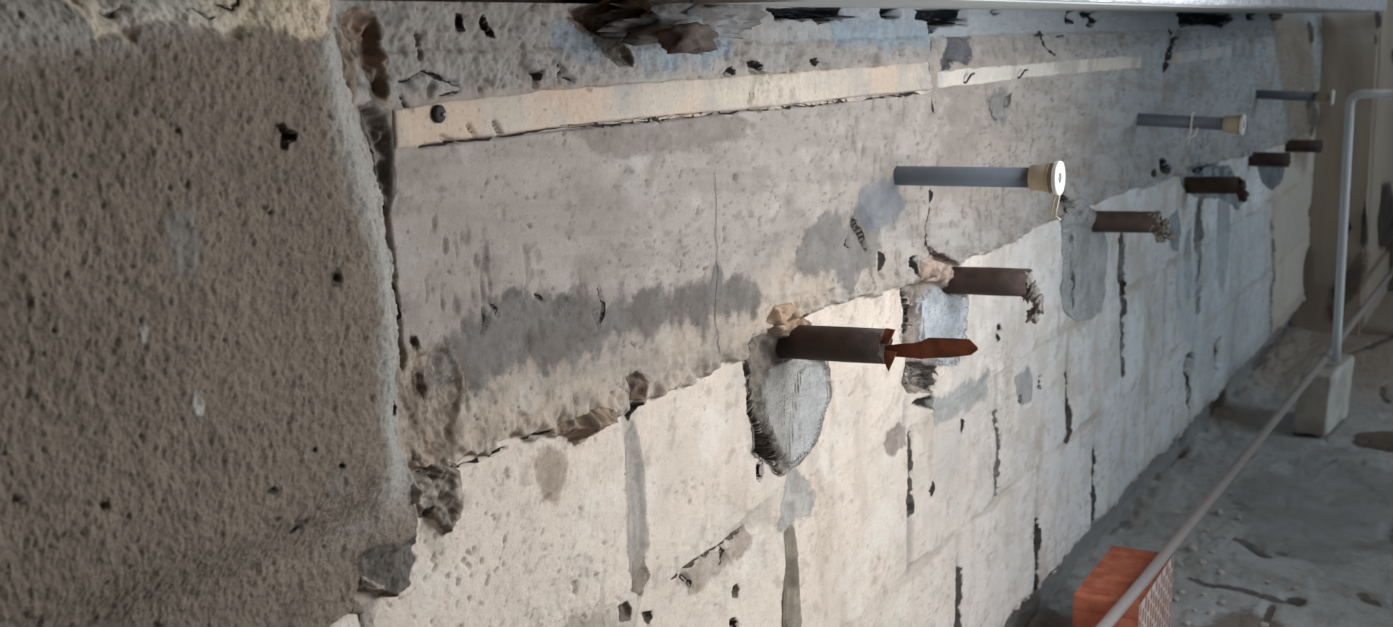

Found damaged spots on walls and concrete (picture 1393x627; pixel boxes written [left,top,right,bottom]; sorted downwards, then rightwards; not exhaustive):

crack [398,35,457,110]
crack [418,33,934,148]
crack [391,268,401,321]
crack [592,288,606,326]
crack [844,218,886,271]
spalling [899,246,969,409]
spalling [1059,194,1108,321]
spalling [392,336,465,472]
spalling [625,371,649,420]
spalling [743,325,832,482]
crack [455,431,550,468]
spalling [619,601,653,624]